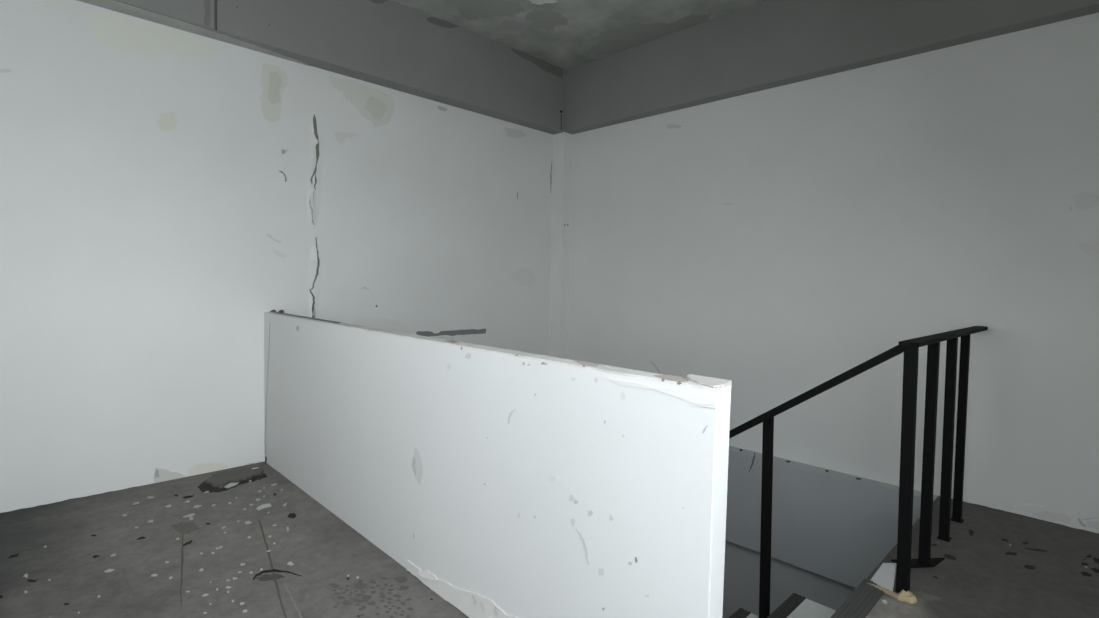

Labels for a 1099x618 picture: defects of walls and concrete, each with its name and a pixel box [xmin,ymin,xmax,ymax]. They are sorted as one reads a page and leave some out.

damp [260,63,288,124]
crack [309,114,320,318]
spalling [416,329,486,338]
flaking render [405,560,518,618]